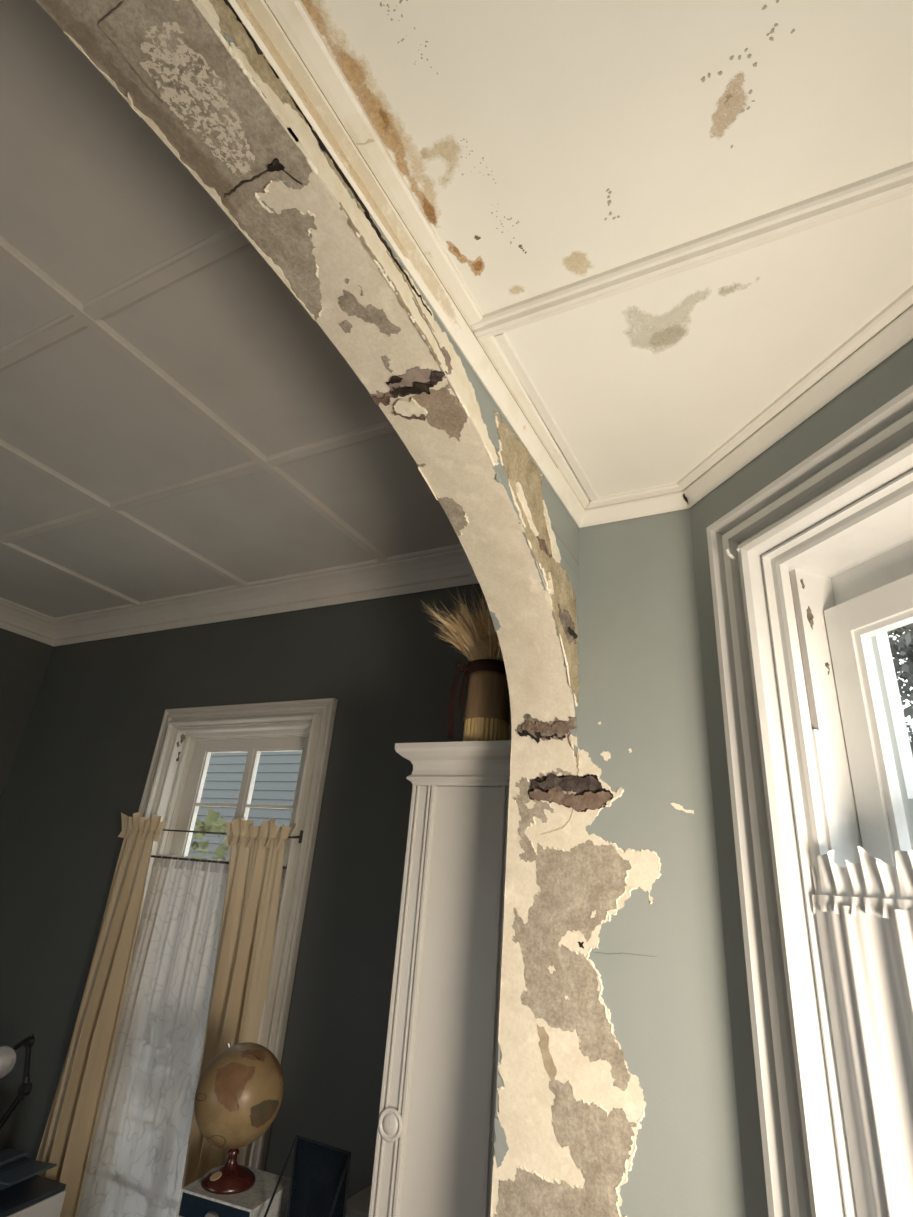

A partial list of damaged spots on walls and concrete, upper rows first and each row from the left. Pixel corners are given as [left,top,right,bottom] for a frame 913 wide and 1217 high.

water stain [238,0,407,256]
crack [224,0,558,468]
peeling [36,0,662,1217]